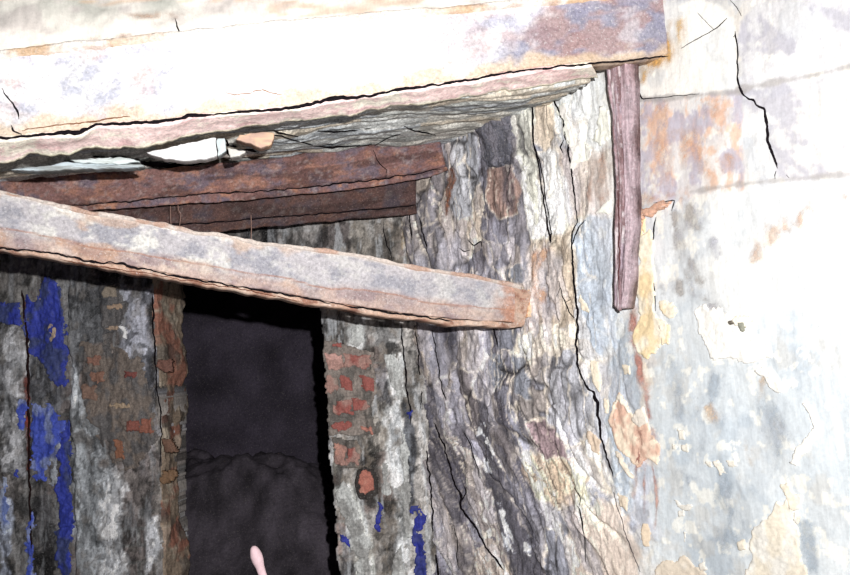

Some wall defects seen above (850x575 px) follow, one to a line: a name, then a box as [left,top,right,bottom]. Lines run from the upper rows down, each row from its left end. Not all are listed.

crack [0,0,789,206]
peeling [0,276,69,387]
crack [531,101,640,571]
flaking render [632,219,678,359]
flaking render [694,303,785,393]
peeling [0,469,19,534]
peeling [16,399,76,575]
crack [0,247,504,575]
flaking render [586,431,601,455]
spalling [590,360,660,479]
flaking render [737,483,808,575]